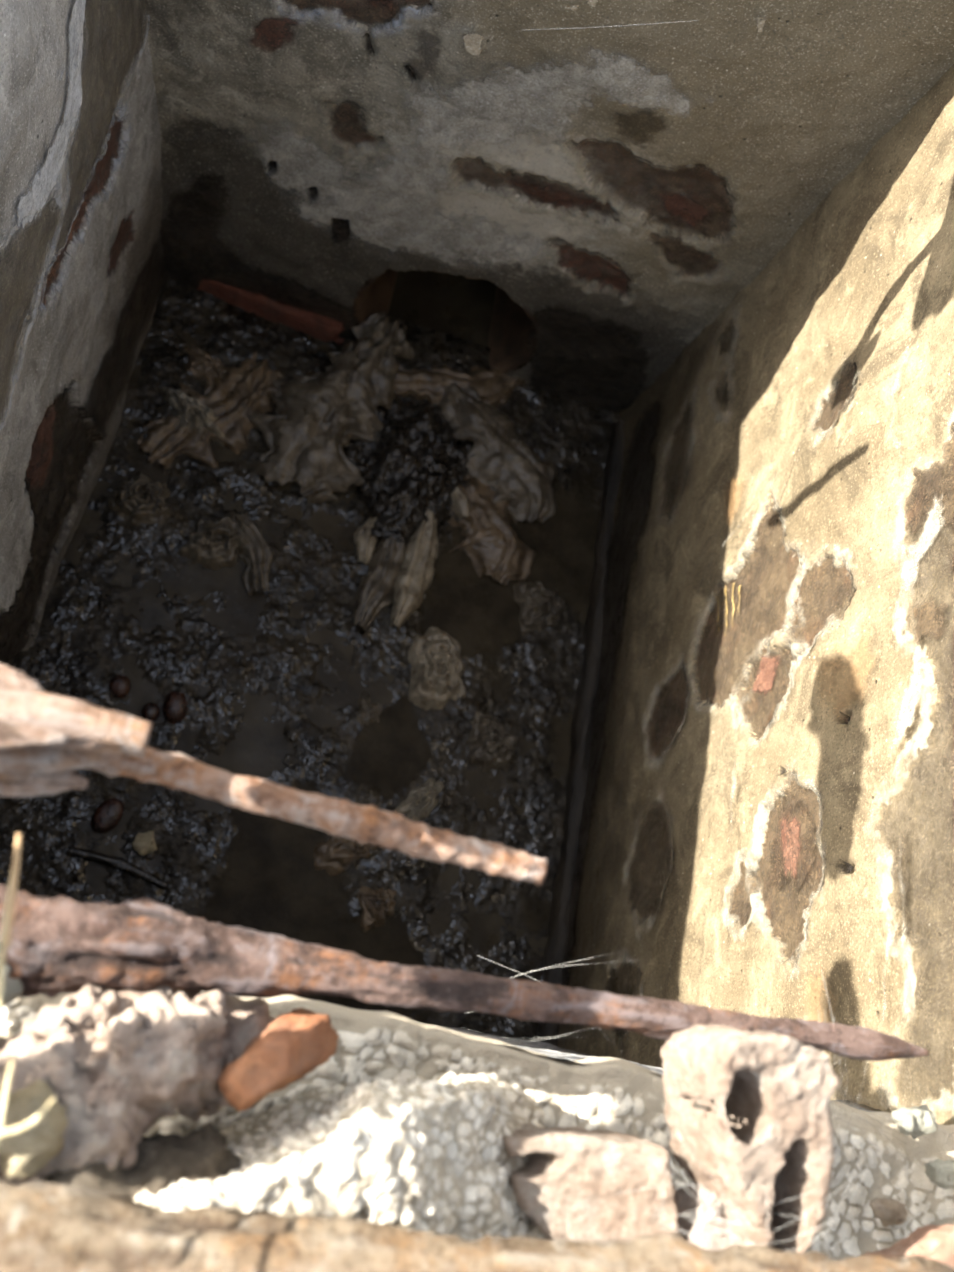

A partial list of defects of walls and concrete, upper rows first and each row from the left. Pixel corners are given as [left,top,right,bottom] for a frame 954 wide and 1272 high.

flaking render [251,0,432,55]
flaking render [325,100,384,151]
flaking render [455,138,733,276]
flaking render [550,237,630,296]
flaking render [813,362,857,439]
flaking render [647,496,856,762]
flaking render [728,772,827,968]